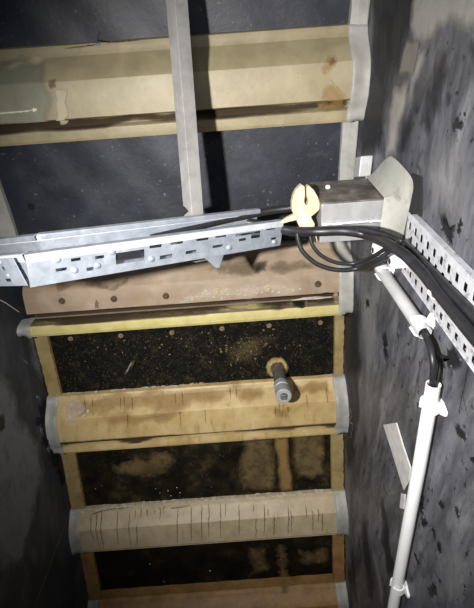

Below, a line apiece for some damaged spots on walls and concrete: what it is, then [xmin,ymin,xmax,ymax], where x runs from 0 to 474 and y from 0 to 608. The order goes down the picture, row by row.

leakage [424,55,449,130]